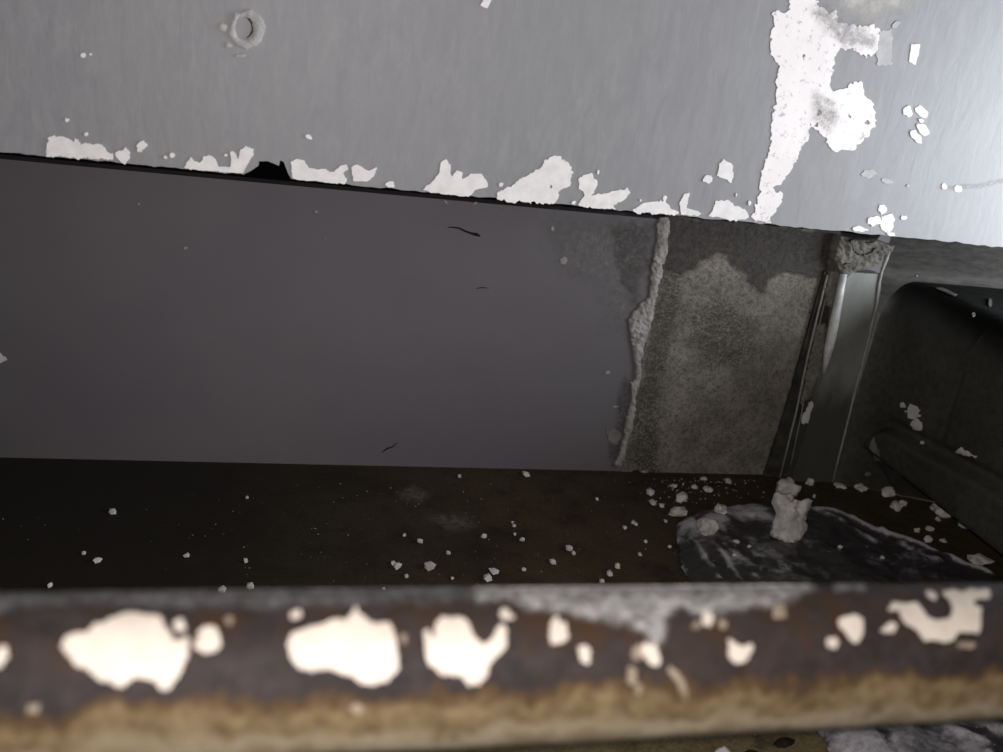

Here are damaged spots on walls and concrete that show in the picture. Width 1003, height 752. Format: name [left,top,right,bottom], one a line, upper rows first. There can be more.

peeling [46,132,148,164]
peeling [184,146,254,173]
peeling [290,159,377,184]
spalling [423,0,907,477]
damp [666,215,841,293]
peeling [61,612,233,690]
peeling [287,606,407,685]
peeling [423,608,515,686]
peeling [549,616,568,645]
peeling [691,611,753,664]
peeling [826,614,863,649]
peeling [880,588,991,649]